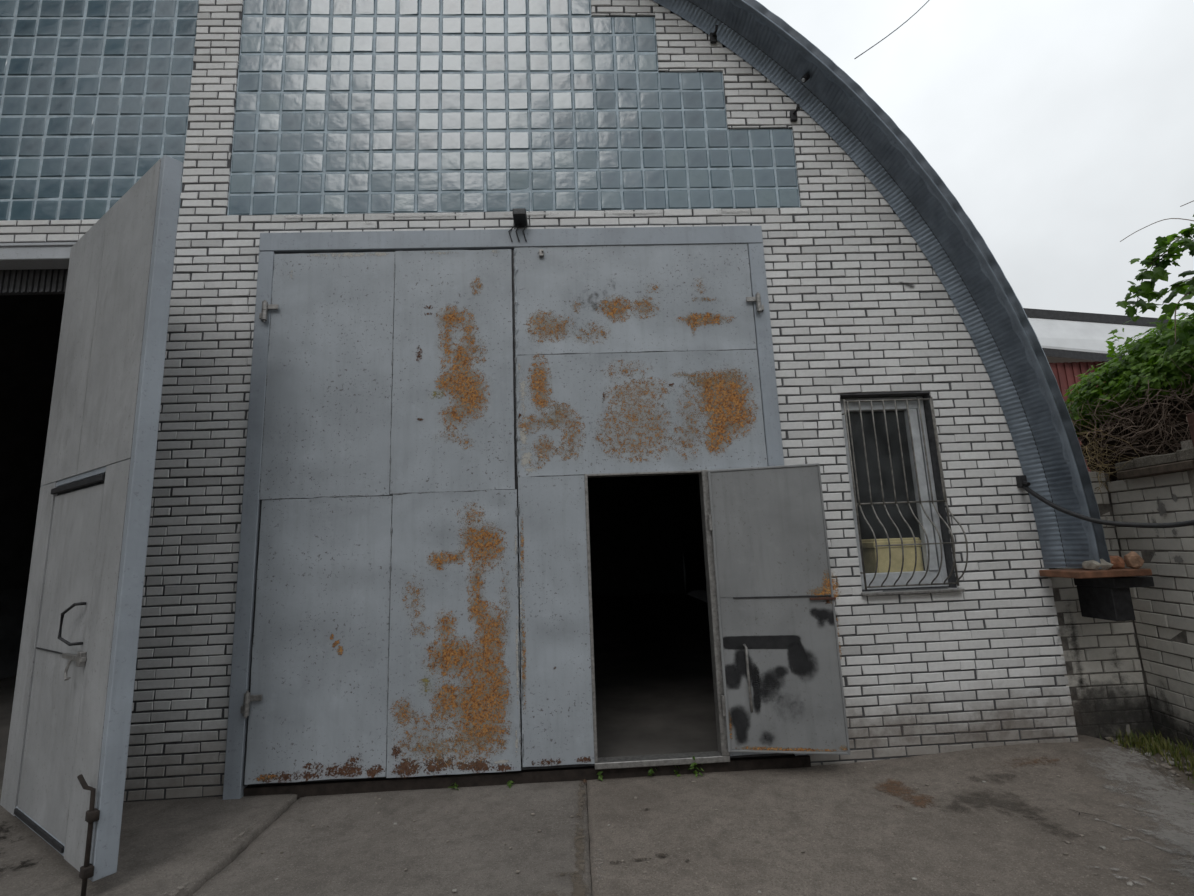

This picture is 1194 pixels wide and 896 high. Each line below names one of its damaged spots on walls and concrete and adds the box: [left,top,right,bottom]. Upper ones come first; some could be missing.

rust [425,304,490,449]
rust [518,278,758,469]
rust [253,503,526,783]